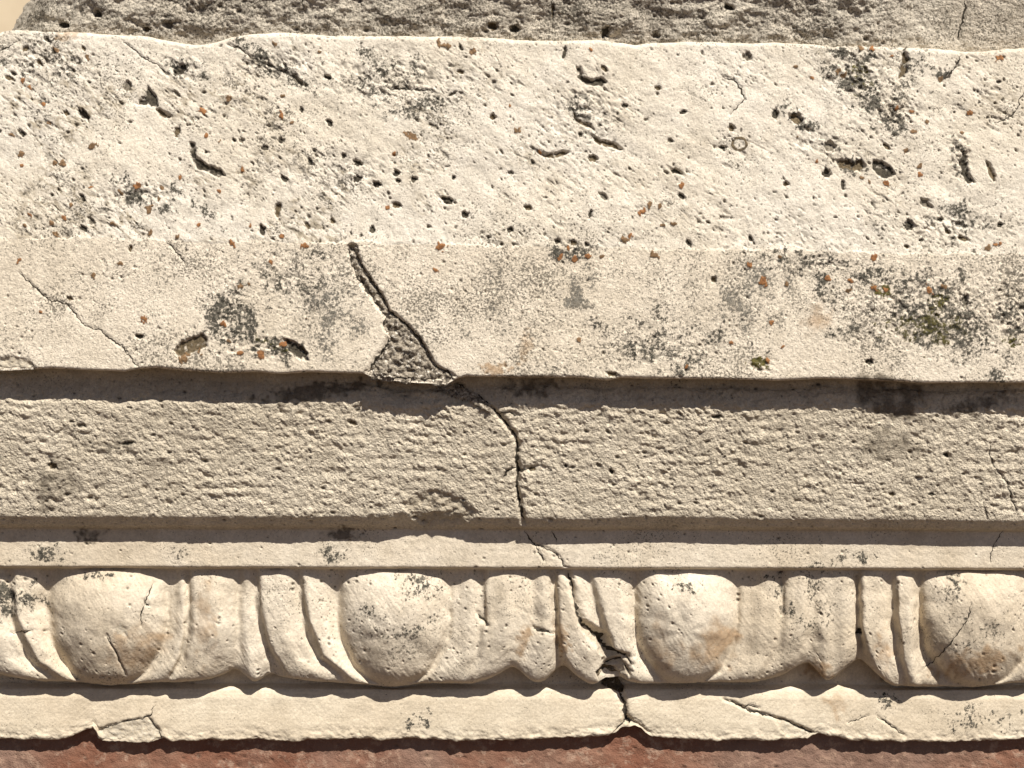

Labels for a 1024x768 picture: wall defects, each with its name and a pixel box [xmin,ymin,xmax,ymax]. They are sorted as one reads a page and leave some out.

crack [20,273,138,366]
crack [348,249,632,729]
crack [925,606,971,667]
crack [727,700,812,732]